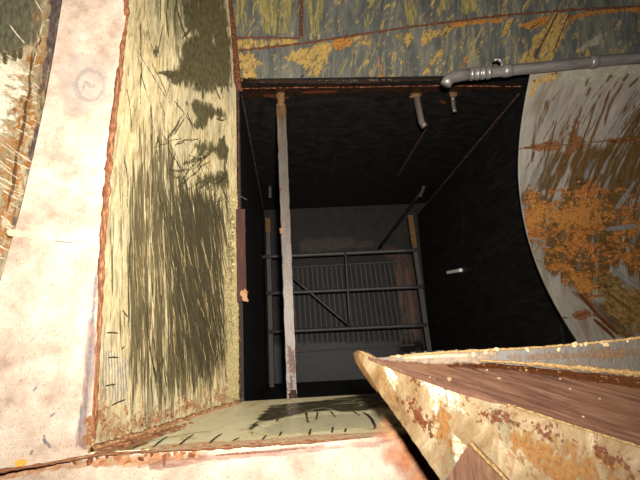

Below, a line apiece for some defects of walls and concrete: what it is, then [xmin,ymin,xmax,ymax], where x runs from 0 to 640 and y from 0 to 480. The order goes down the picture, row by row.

rust [396,16,513,47]
rust [519,5,640,63]
rust [0,33,44,251]
damp [128,0,229,401]
rust [378,246,640,388]
rust [0,277,340,480]
damp [250,397,403,436]
rust [353,351,455,453]
rust [381,424,440,480]
rust [476,401,640,480]